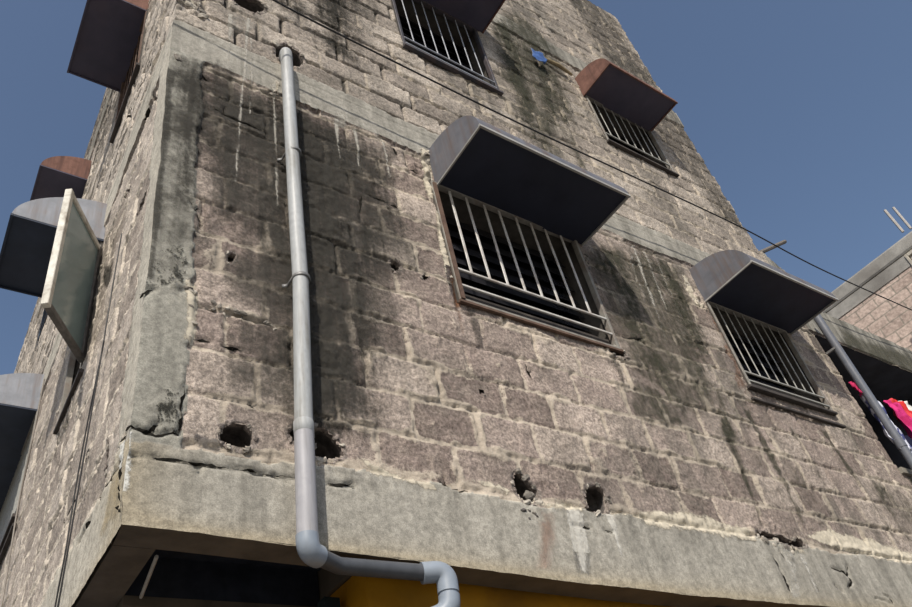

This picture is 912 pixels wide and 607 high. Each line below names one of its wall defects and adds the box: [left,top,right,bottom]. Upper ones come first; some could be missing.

spalling [232,0,268,15]
water stain [146,18,287,289]
water stain [297,112,381,428]
water stain [588,245,752,496]
water stain [153,387,179,436]
crack [64,390,295,529]
spalling [214,419,259,454]
spalling [314,423,347,465]
crack [328,481,354,489]
spalling [510,468,543,520]
spalling [582,482,612,516]
water stain [759,437,800,517]